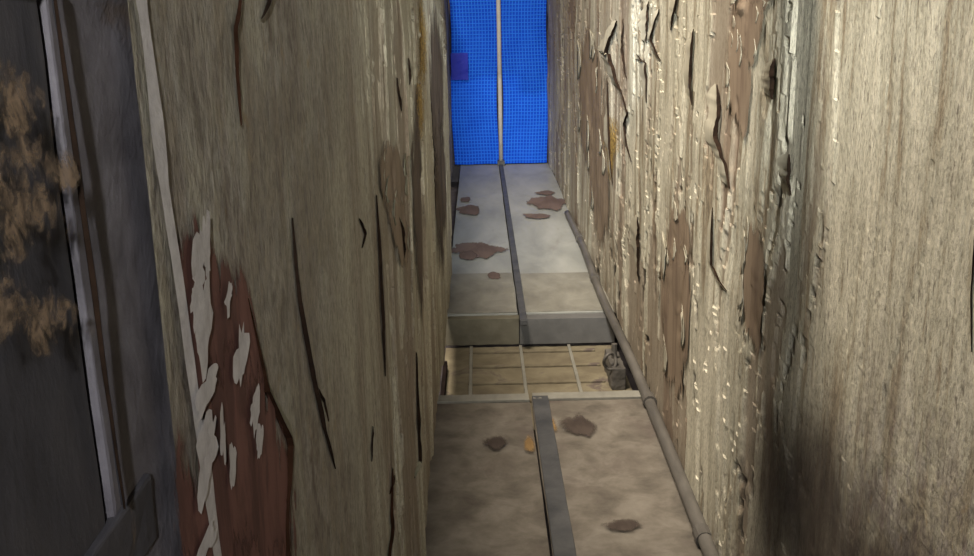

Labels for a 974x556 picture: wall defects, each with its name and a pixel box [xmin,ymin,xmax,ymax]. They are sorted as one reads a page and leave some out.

crack [599,0,730,189]
crack [761,58,776,100]
peeling [136,0,297,556]
crack [248,297,294,556]
crack [292,217,336,469]
crack [359,195,406,376]
crack [371,352,422,556]
rust [456,197,479,215]
rust [451,242,506,260]
rust [523,190,566,219]
crack [707,207,727,291]
water stain [760,427,886,556]